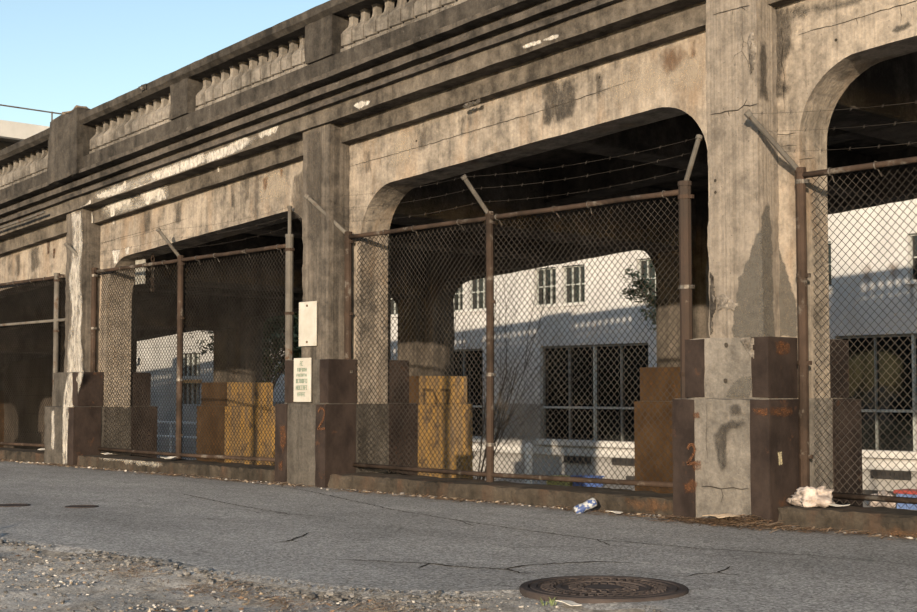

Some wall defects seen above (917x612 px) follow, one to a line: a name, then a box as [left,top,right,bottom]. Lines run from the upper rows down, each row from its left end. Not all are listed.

water stain [543,81,574,124]
crack [777,0,917,108]
water stain [51,126,278,464]
water stain [732,205,797,338]
water stain [715,377,752,469]
crack [181,423,912,576]